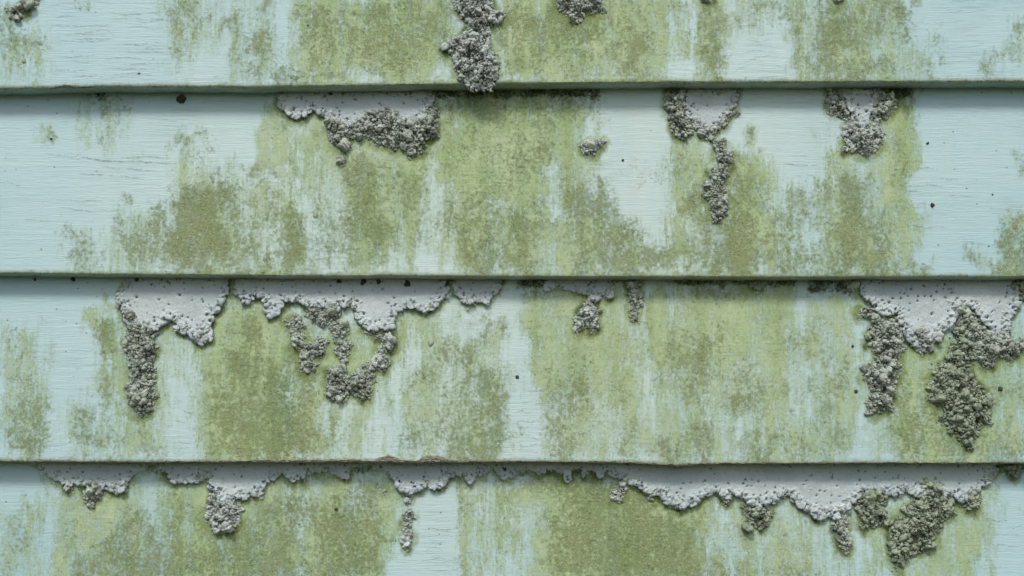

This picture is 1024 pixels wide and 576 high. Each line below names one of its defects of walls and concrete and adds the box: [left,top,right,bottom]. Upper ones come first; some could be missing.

spalling [438,0,509,93]
spalling [553,0,607,25]
water stain [806,0,914,81]
water stain [118,156,392,274]
peeling [274,90,441,168]
water stain [435,77,933,319]
peeling [662,88,741,225]
peeling [823,87,897,161]
water stain [206,317,319,462]
peeling [0,278,1024,576]
water stain [74,487,386,576]
water stain [520,472,724,576]